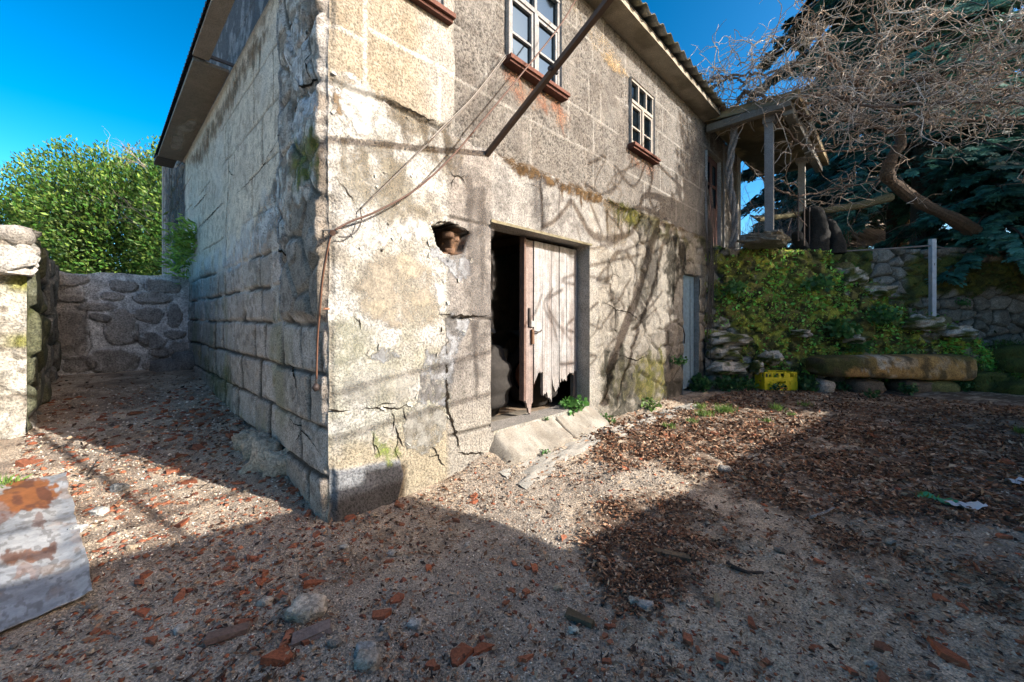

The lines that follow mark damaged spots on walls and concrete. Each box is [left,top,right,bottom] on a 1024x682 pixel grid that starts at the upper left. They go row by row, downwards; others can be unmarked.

rust [507,69,566,126]
crack [328,403,407,458]
spalling [349,216,474,455]
crack [429,314,487,465]